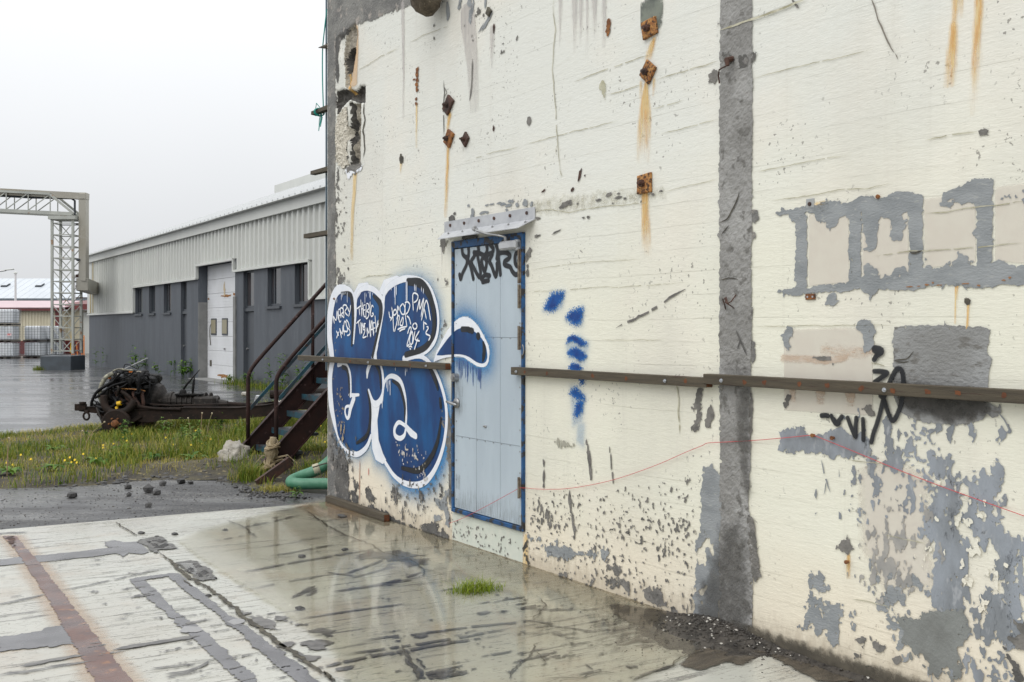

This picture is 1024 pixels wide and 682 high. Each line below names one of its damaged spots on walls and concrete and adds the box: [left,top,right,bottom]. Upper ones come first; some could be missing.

rust [974,0,982,47]
rust [639,80,654,124]
peeling [323,0,762,632]
peeling [778,396,1024,682]
peeling [414,659,476,681]
peeling [455,621,612,672]